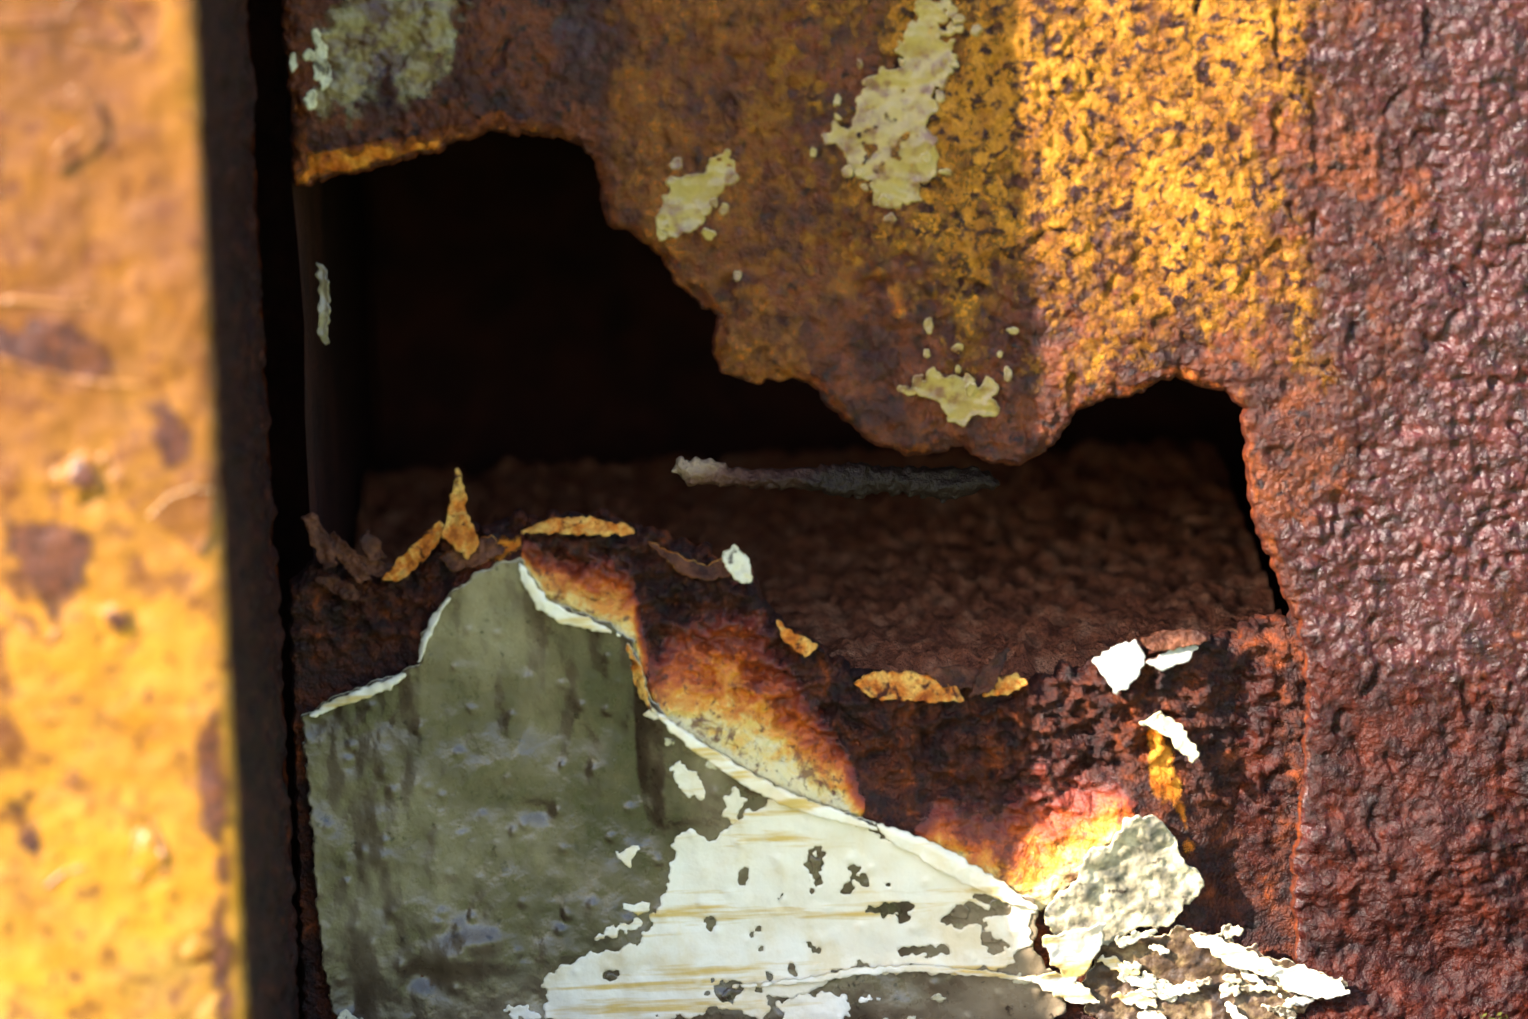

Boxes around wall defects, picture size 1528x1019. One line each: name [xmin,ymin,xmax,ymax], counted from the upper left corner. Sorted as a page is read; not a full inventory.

peeling [289,0,464,128]
peeling [810,0,983,222]
peeling [656,149,739,241]
rust [605,0,869,383]
rust [799,171,882,301]
peeling [315,262,331,345]
peeling [897,317,1012,427]
rust [3,520,91,627]
rust [671,456,1000,504]
rust [864,0,1528,1019]
rust [288,468,1308,1019]
peeling [301,558,1350,1019]